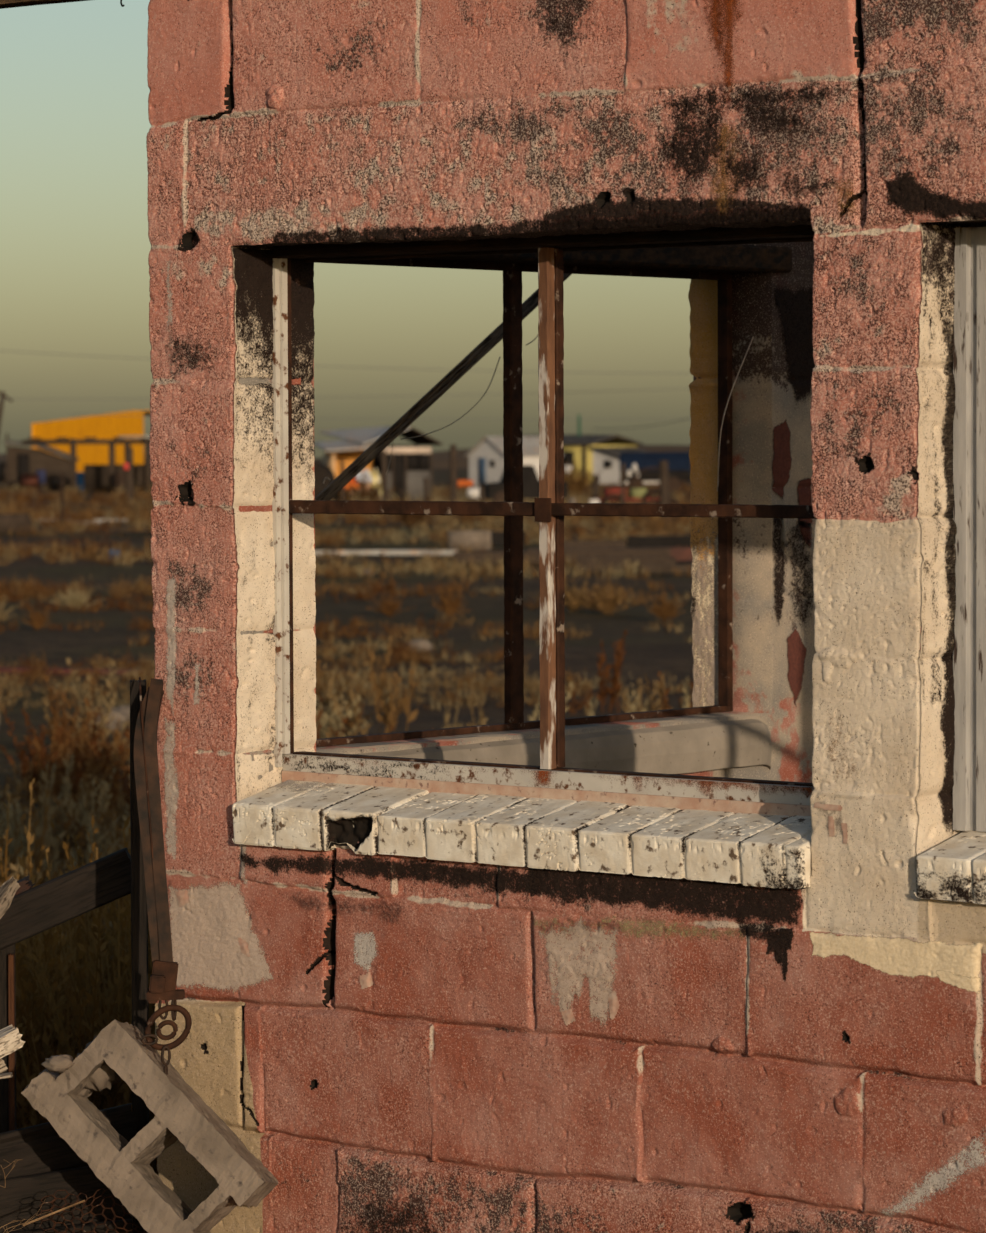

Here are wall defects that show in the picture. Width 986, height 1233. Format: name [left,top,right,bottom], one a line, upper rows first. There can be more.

rust [704,0,744,102]
spalling [325,815,375,852]
peeling [168,881,274,993]
crack [306,848,378,1007]
peeling [354,931,377,989]
peeling [539,916,619,1030]
peeling [936,970,981,994]